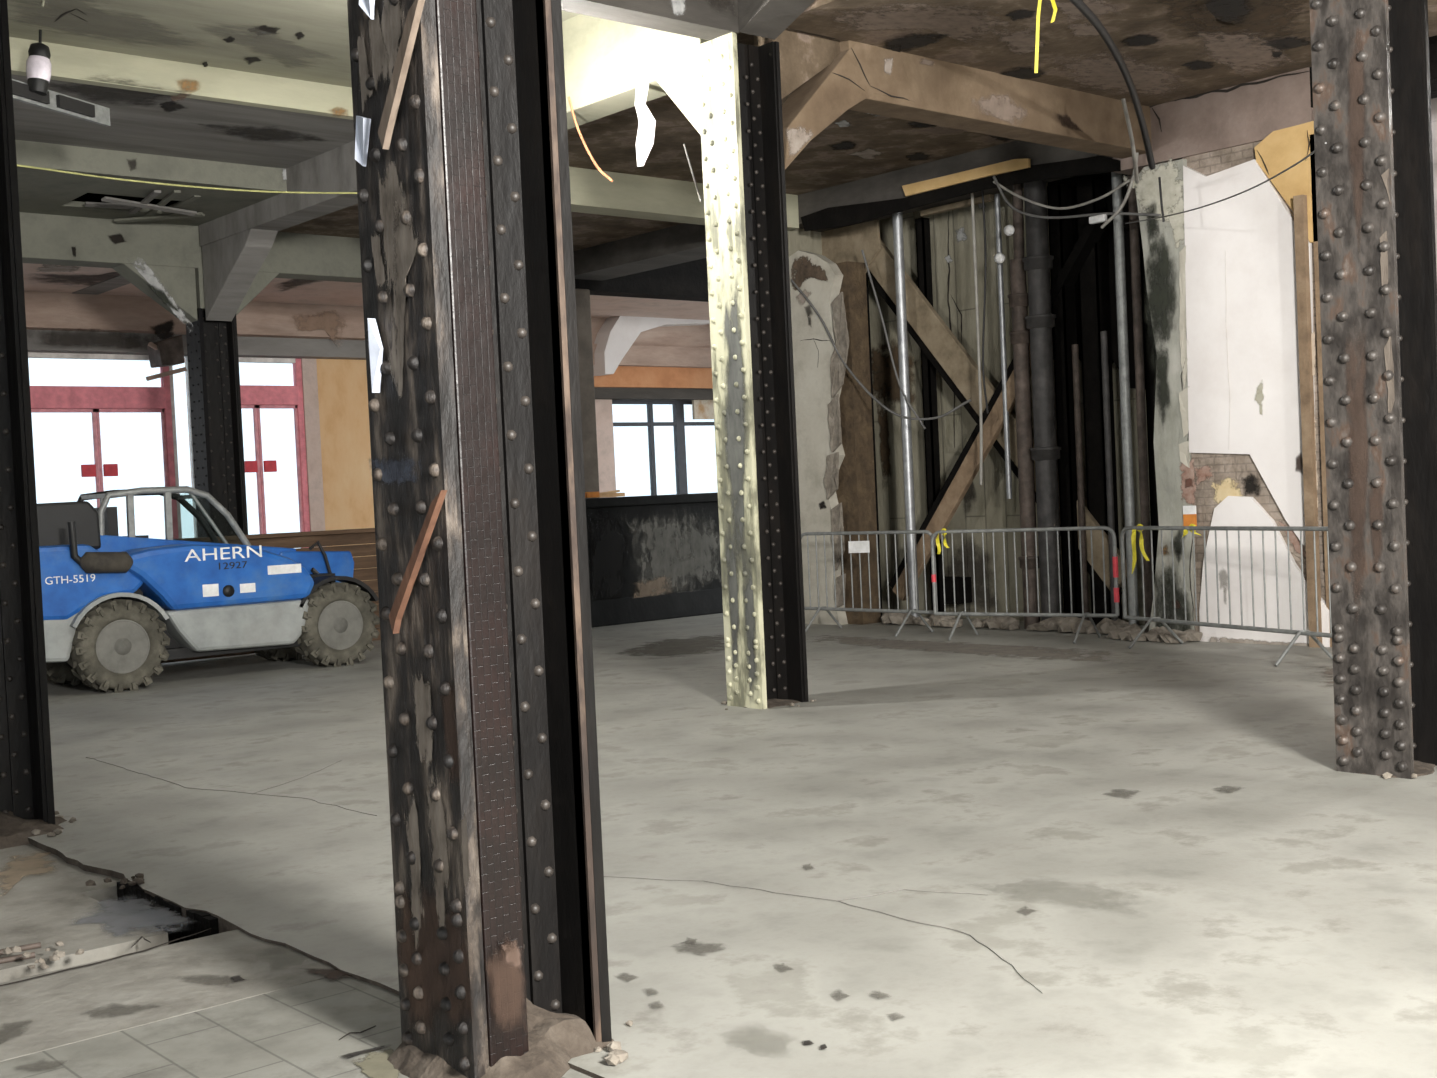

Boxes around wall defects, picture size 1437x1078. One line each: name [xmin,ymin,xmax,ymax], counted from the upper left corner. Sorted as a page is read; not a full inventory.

leakage [1158,0,1307,39]
peeling [371,162,418,397]
leakage [1145,204,1176,422]
spalling [1123,159,1326,646]
rust [1347,350,1383,593]
crack [86,757,377,816]
peeling [404,673,470,949]
rust [442,685,460,780]
spalling [117,882,219,945]
rust [399,891,473,1025]
rust [487,941,523,1027]
crack [604,876,1043,994]